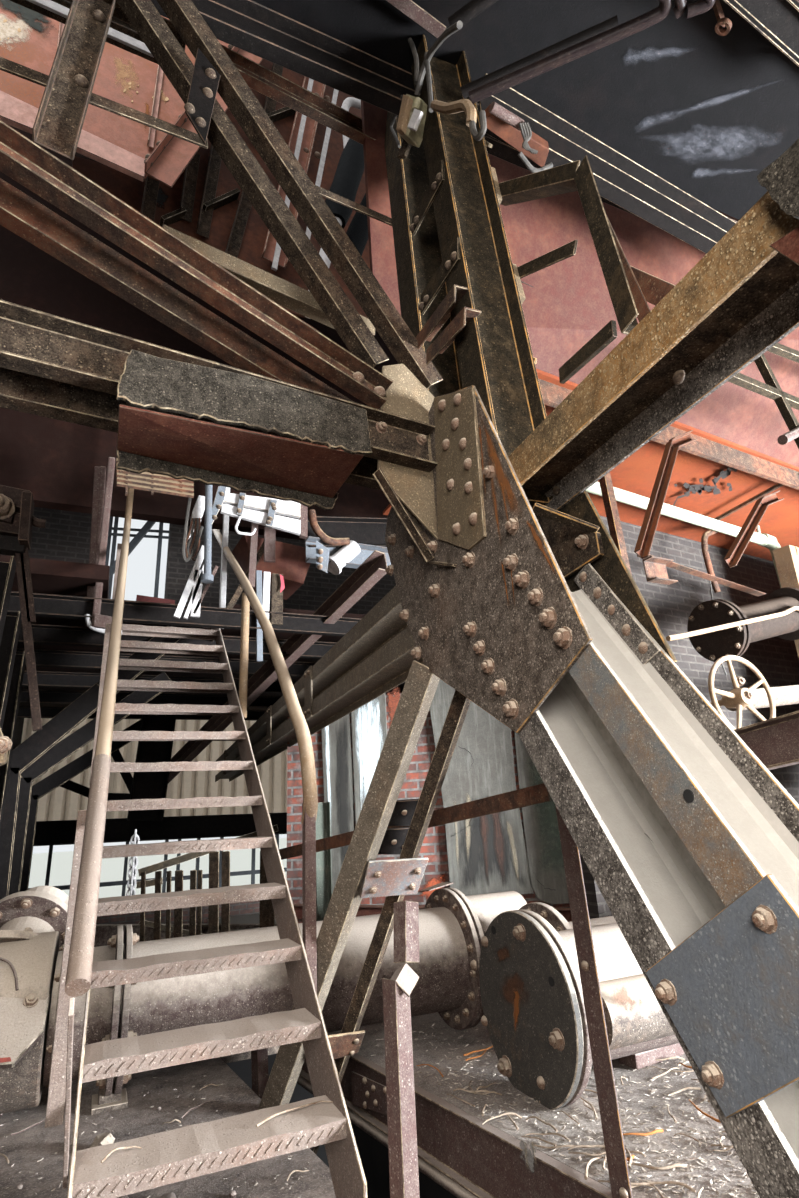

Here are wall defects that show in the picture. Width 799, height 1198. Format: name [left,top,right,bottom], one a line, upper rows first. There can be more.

corrosion [479,418,517,536]
corrosion [527,521,555,573]